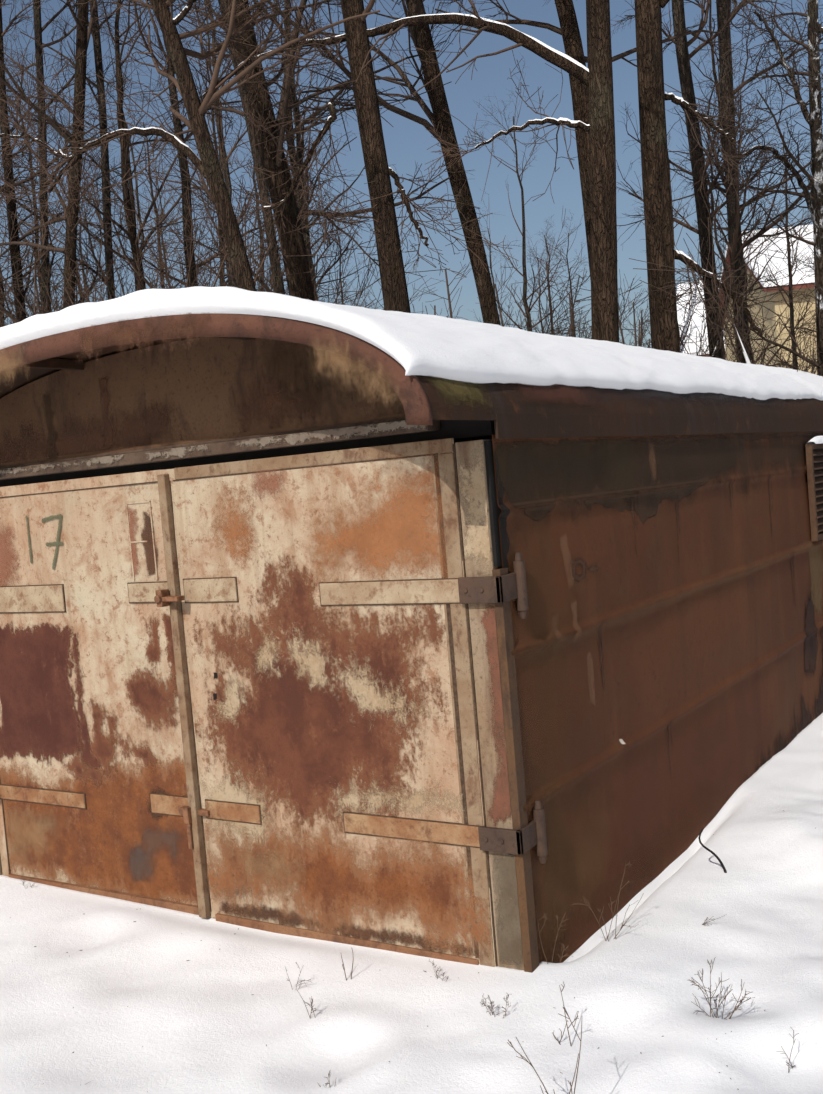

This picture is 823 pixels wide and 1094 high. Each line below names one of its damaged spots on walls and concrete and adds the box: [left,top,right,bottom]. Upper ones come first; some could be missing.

corrosion [497,432,823,451]
corrosion [214,471,282,562]
corrosion [312,460,448,580]
corrosion [745,593,823,782]
corrosion [0,758,491,957]